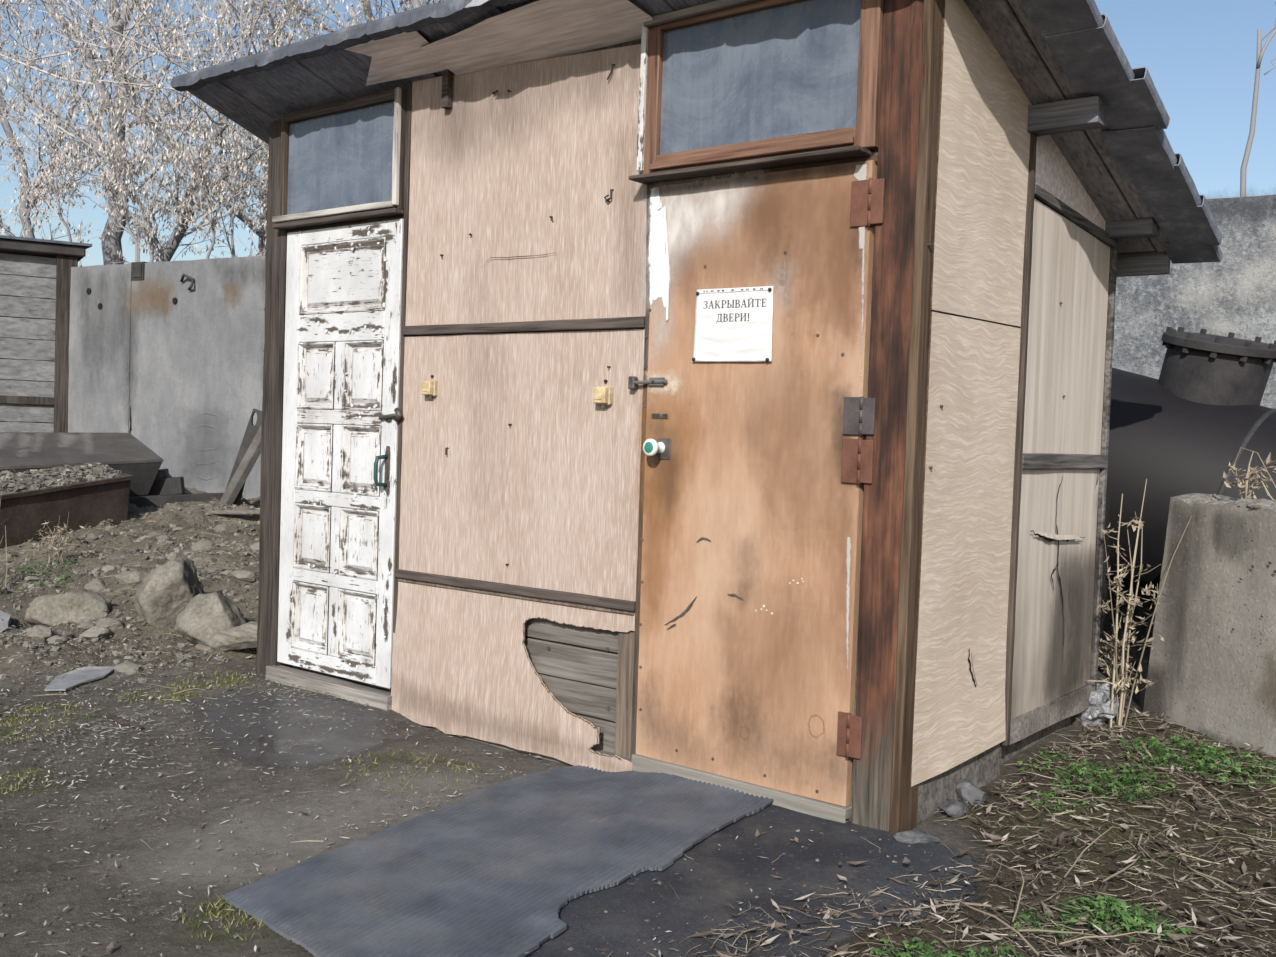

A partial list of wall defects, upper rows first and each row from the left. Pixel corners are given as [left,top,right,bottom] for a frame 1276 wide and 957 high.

peeling [305,224,395,308]
peeling [648,171,763,321]
peeling [297,318,384,334]
peeling [331,358,397,419]
peeling [340,450,390,512]